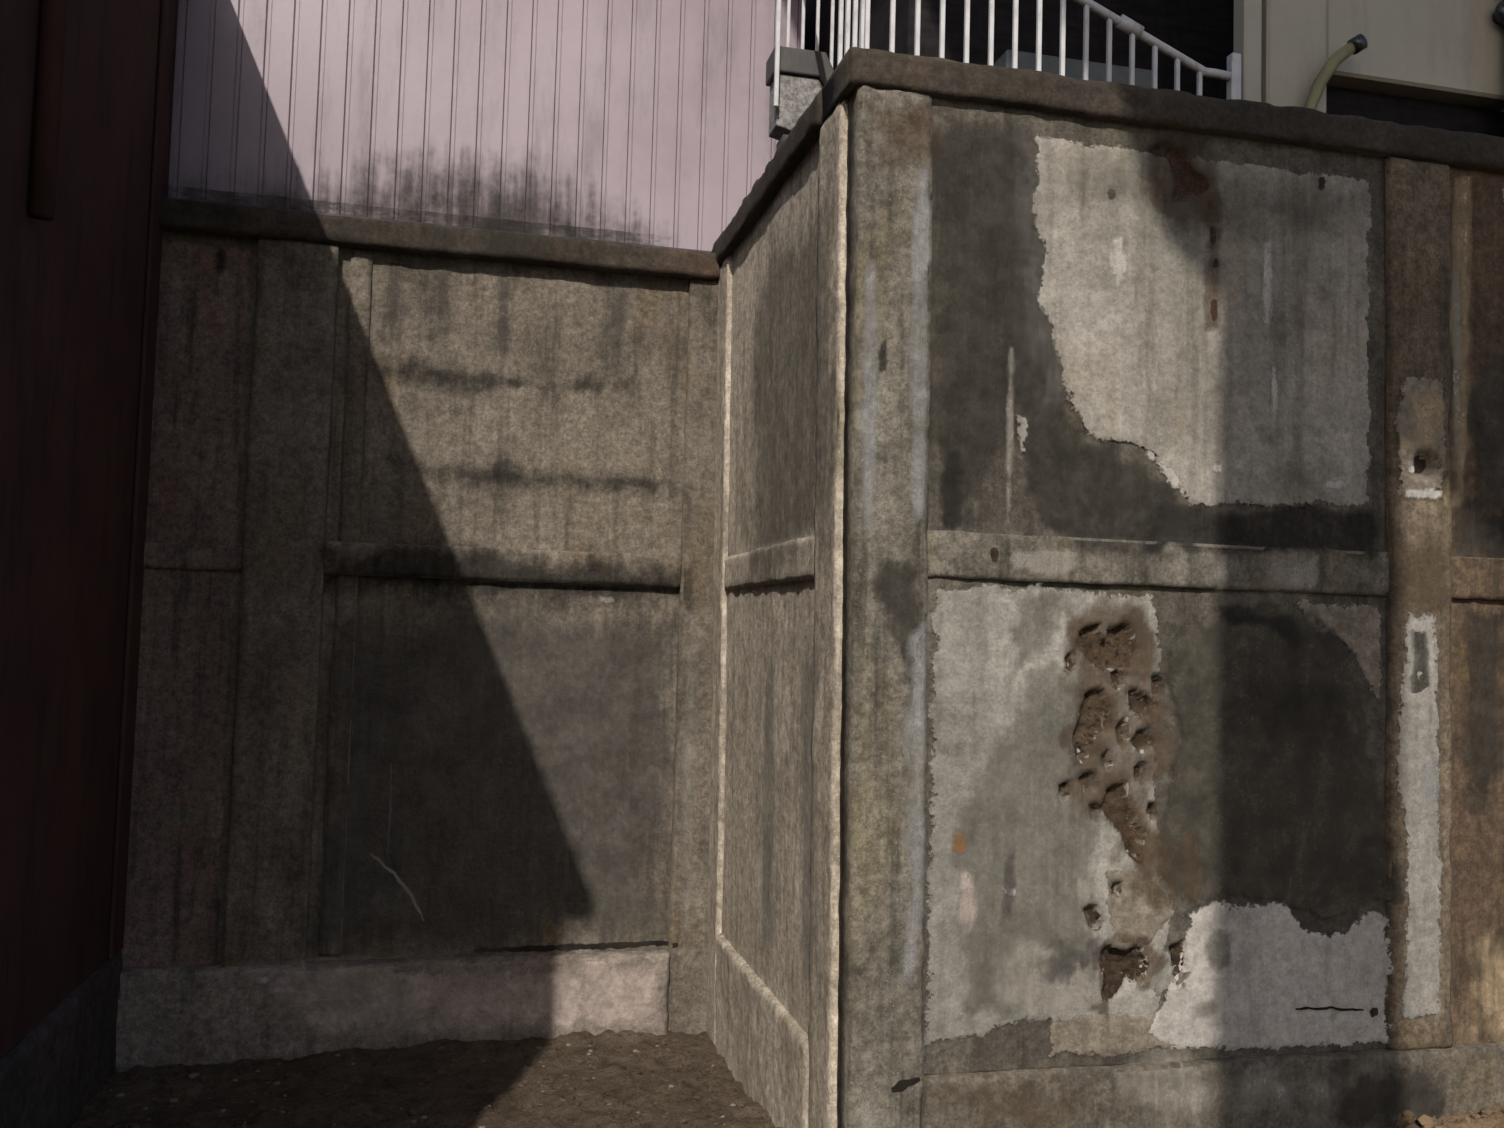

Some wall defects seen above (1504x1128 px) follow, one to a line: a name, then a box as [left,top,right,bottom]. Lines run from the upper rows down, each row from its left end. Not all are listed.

peeling [1032,134,1373,507]
corrosion [1207,199,1219,324]
peeling [1016,415,1028,456]
water stain [912,124,1405,919]
spalling [1394,376,1448,498]
water stain [1455,353,1504,558]
water stain [1467,615,1504,808]
water stain [957,668,1101,1016]
peeling [924,582,1444,1058]